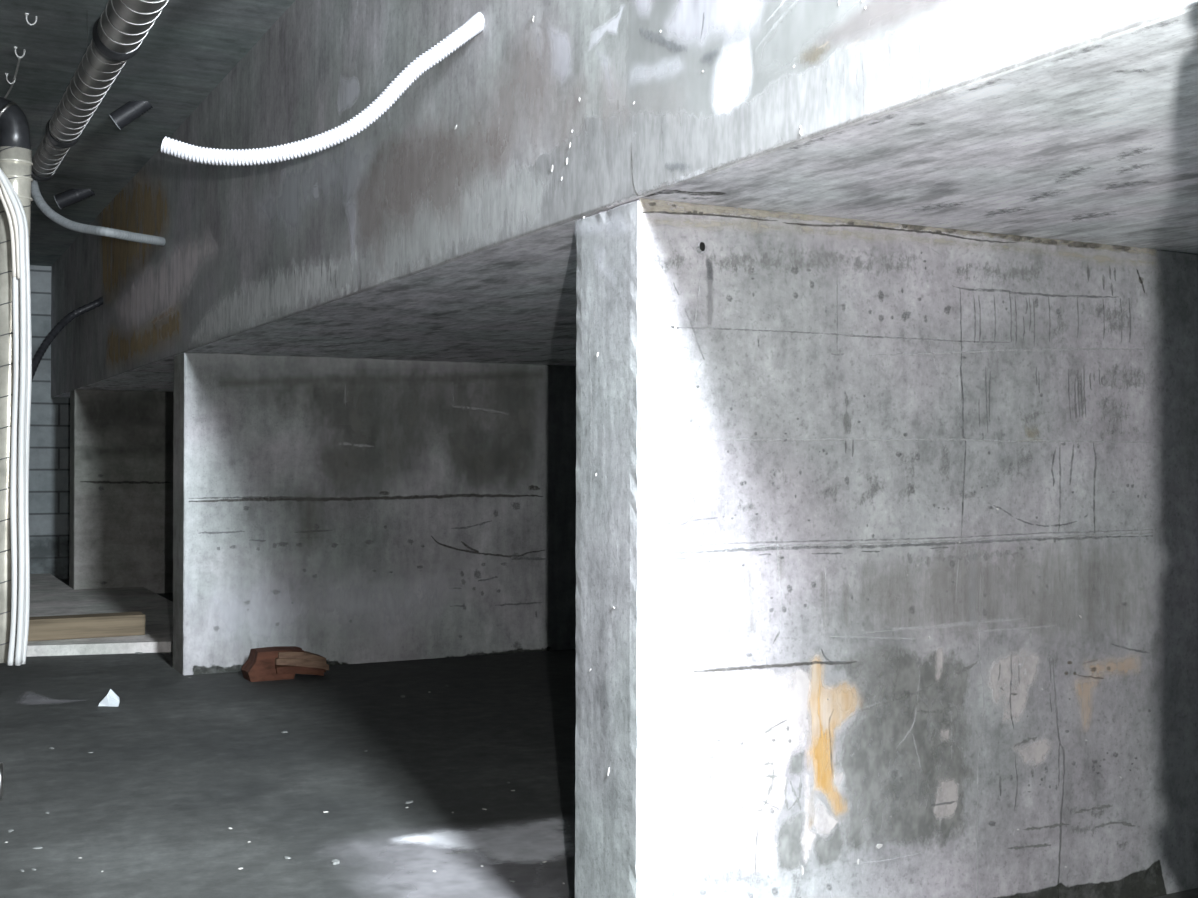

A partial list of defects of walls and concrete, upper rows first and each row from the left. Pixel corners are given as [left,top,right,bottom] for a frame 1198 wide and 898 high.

crack [80,474,545,607]
corrosion [808,656,858,814]
leakage [845,541,1167,898]